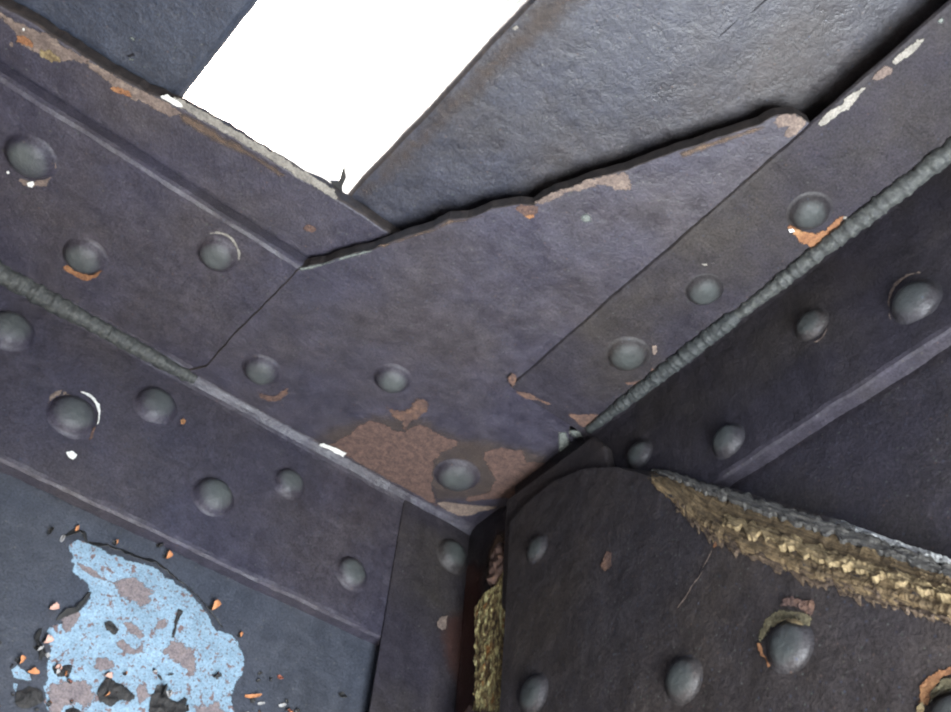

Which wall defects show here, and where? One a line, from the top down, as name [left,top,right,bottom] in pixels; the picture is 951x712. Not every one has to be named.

spalling [873,38,925,80]
corrosion [0,12,283,175]
spalling [681,129,758,157]
spalling [773,114,806,138]
spalling [818,88,865,126]
spalling [516,172,632,219]
spalling [300,220,466,271]
corrosion [788,216,844,247]
corrosion [648,468,951,667]
peeling [10,524,244,712]
corrosion [464,532,505,712]
peeling [245,672,284,712]